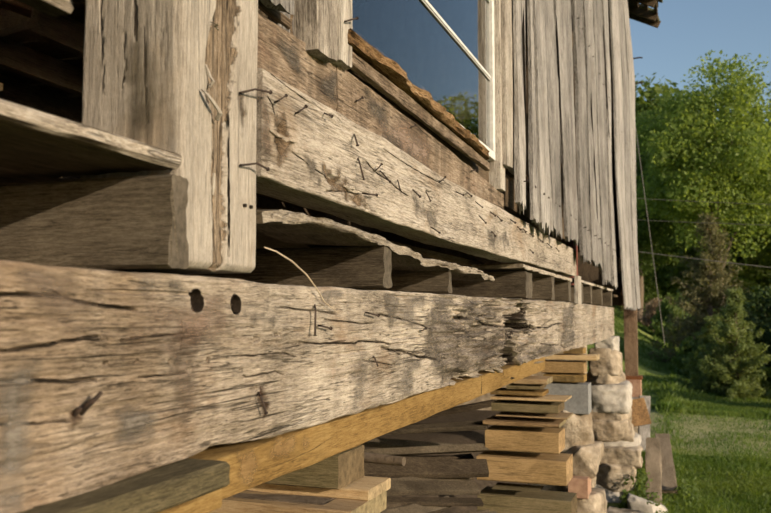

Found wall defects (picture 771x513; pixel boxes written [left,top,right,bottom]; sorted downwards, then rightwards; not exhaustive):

crack [224,110,232,252]
crack [0,290,137,311]
crack [7,336,108,351]
crack [242,307,437,377]
spalling [427,297,507,381]
spalling [517,344,559,364]
crack [0,377,92,385]
crack [0,419,70,427]